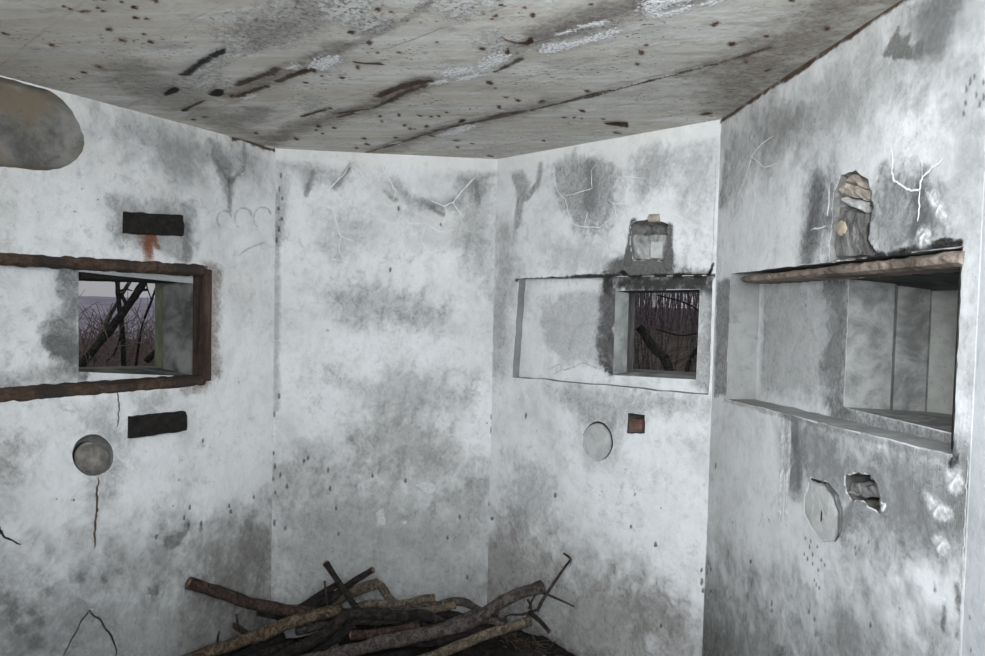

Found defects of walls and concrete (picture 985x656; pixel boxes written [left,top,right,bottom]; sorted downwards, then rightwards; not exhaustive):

water stain [533,0,723,56]
water stain [284,55,345,71]
corrosion [143,235,159,262]
spalling [630,214,668,261]
spalling [830,170,875,262]
crack [826,148,963,263]
crack [0,527,21,545]
crack [92,478,100,548]
spalling [845,472,888,513]
crack [63,610,117,656]